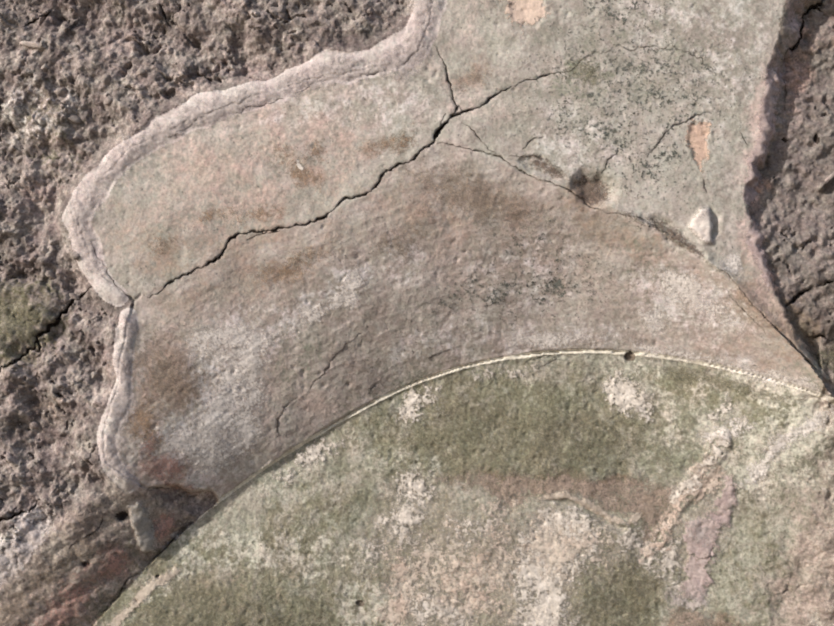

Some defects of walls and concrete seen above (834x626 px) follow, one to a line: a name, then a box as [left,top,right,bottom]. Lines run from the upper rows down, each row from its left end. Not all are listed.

peeling [499,0,551,29]
crack [784,1,822,60]
crack [91,44,720,298]
crack [0,286,92,372]
damp [298,268,365,324]
damp [507,330,608,348]
crack [701,254,832,381]
damp [98,317,300,480]
damp [633,341,831,484]